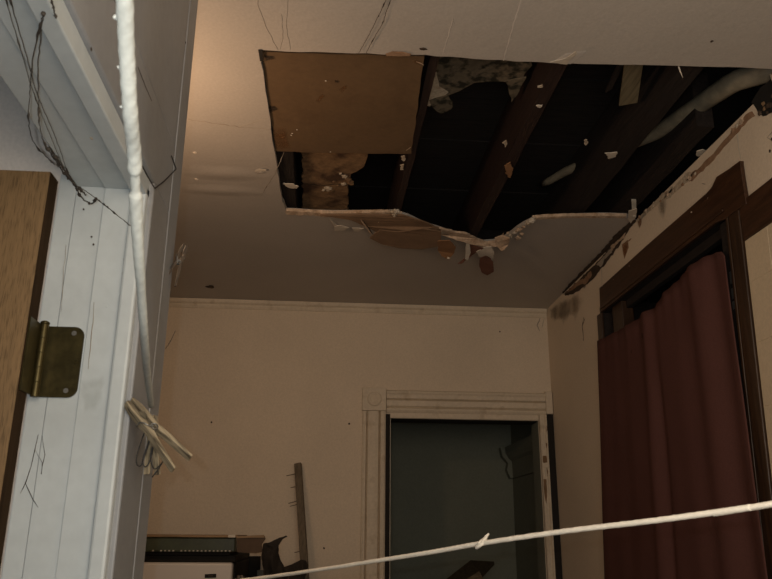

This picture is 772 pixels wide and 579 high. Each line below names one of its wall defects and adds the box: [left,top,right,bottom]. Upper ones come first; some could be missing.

flaking render [635,73,772,223]
spalling [286,208,626,275]
crack [20,437,45,507]